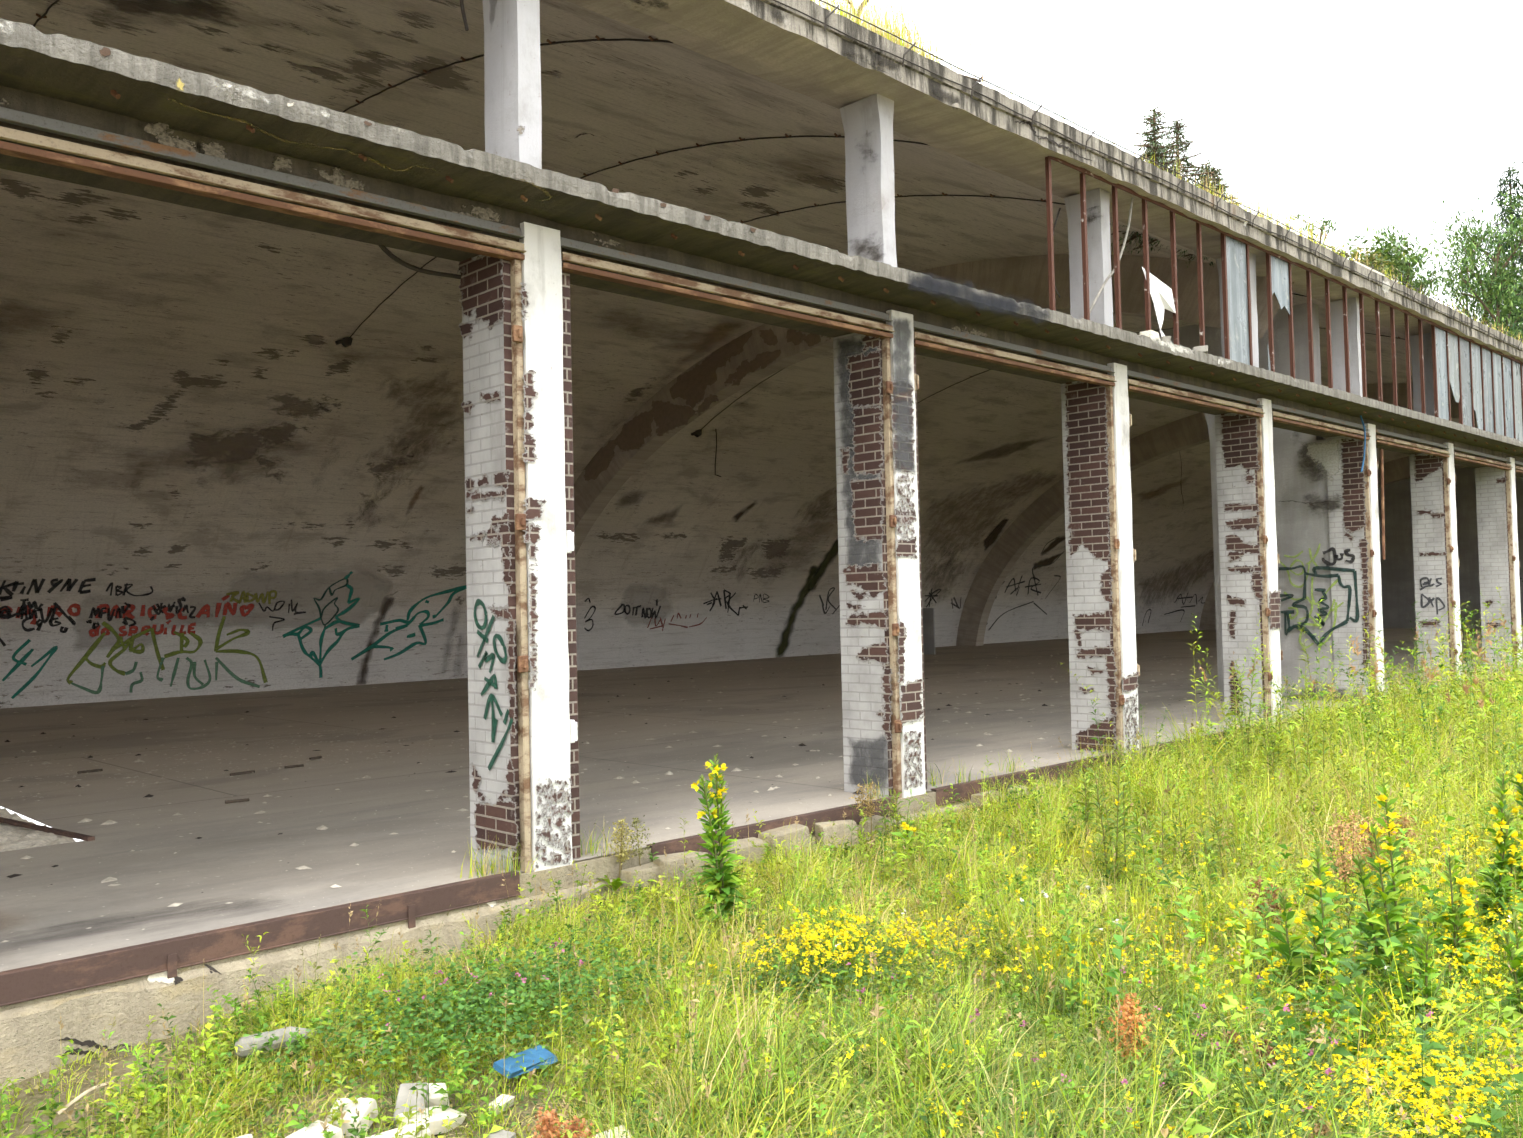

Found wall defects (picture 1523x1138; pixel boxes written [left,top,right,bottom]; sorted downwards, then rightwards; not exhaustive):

damp [90,0,231,36]
peeling [457,255,530,341]
damp [120,391,181,430]
damp [187,394,340,479]
peeling [840,320,918,559]
peeling [1220,414,1260,485]
peeling [461,370,573,869]
peeling [842,562,924,790]
peeling [1064,381,1139,758]
peeling [1224,503,1281,716]